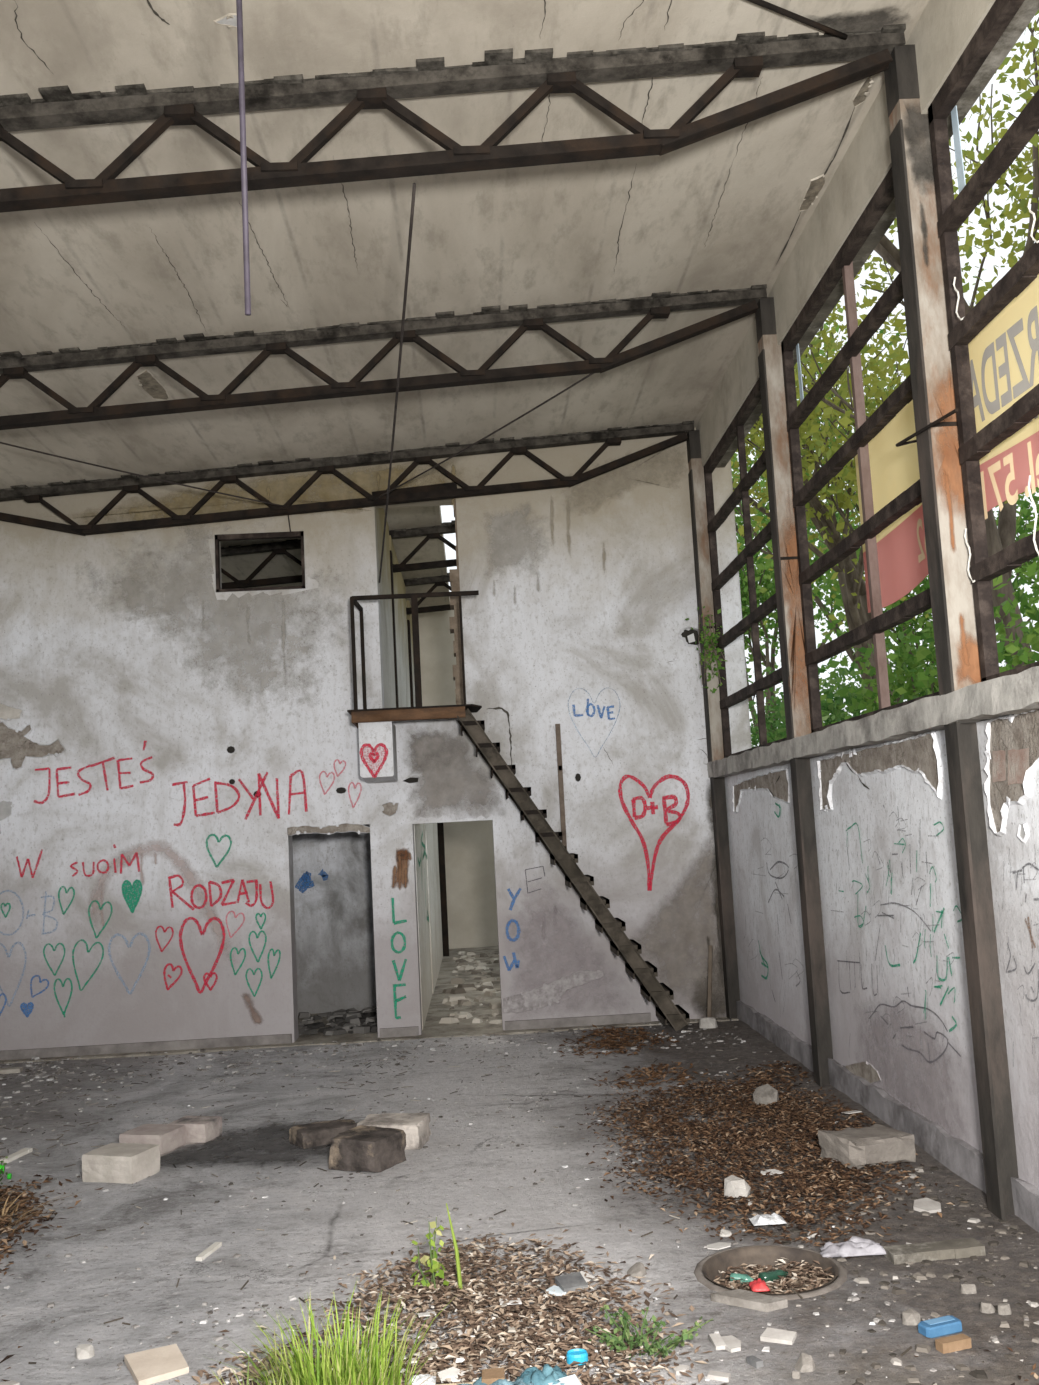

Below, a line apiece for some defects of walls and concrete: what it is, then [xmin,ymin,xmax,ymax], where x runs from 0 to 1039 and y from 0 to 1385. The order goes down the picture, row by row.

crack [14,6,49,69]
crack [619,0,672,39]
crack [615,167,636,266]
corrosion [937,375,965,550]
corrosion [785,488,809,702]
corrosion [958,615,982,683]
flaking render [0,703,66,771]
flaking render [984,709,1039,844]